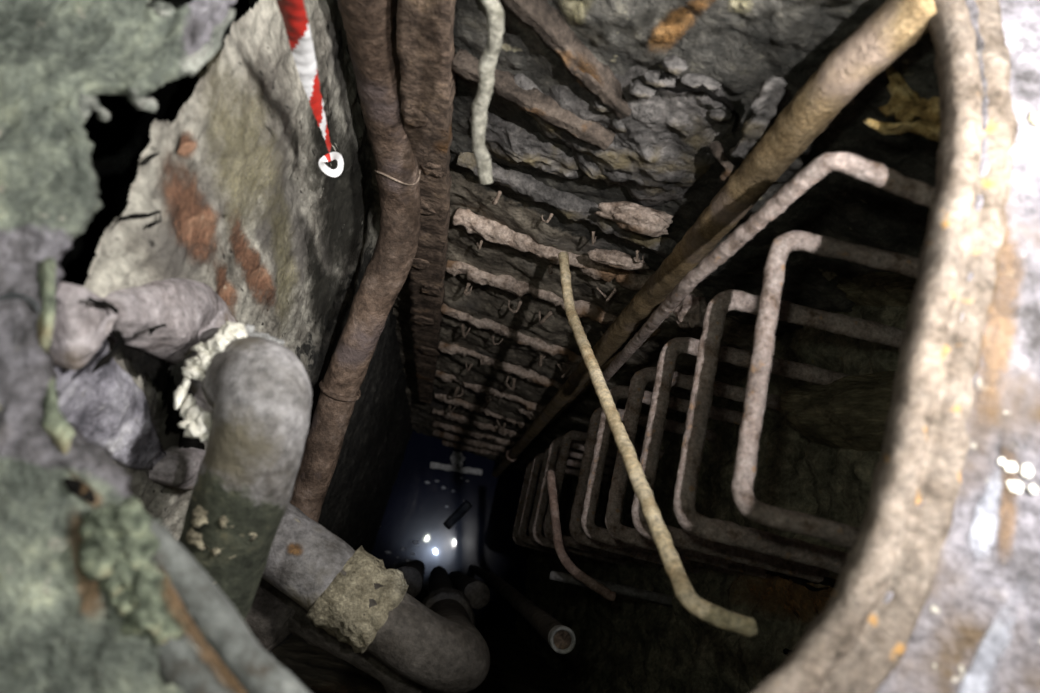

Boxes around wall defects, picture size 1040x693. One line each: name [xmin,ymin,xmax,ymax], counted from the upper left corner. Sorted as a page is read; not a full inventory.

corrosion [651,0,713,46]
corrosion [177,132,197,156]
corrosion [164,166,217,261]
corrosion [217,220,276,314]